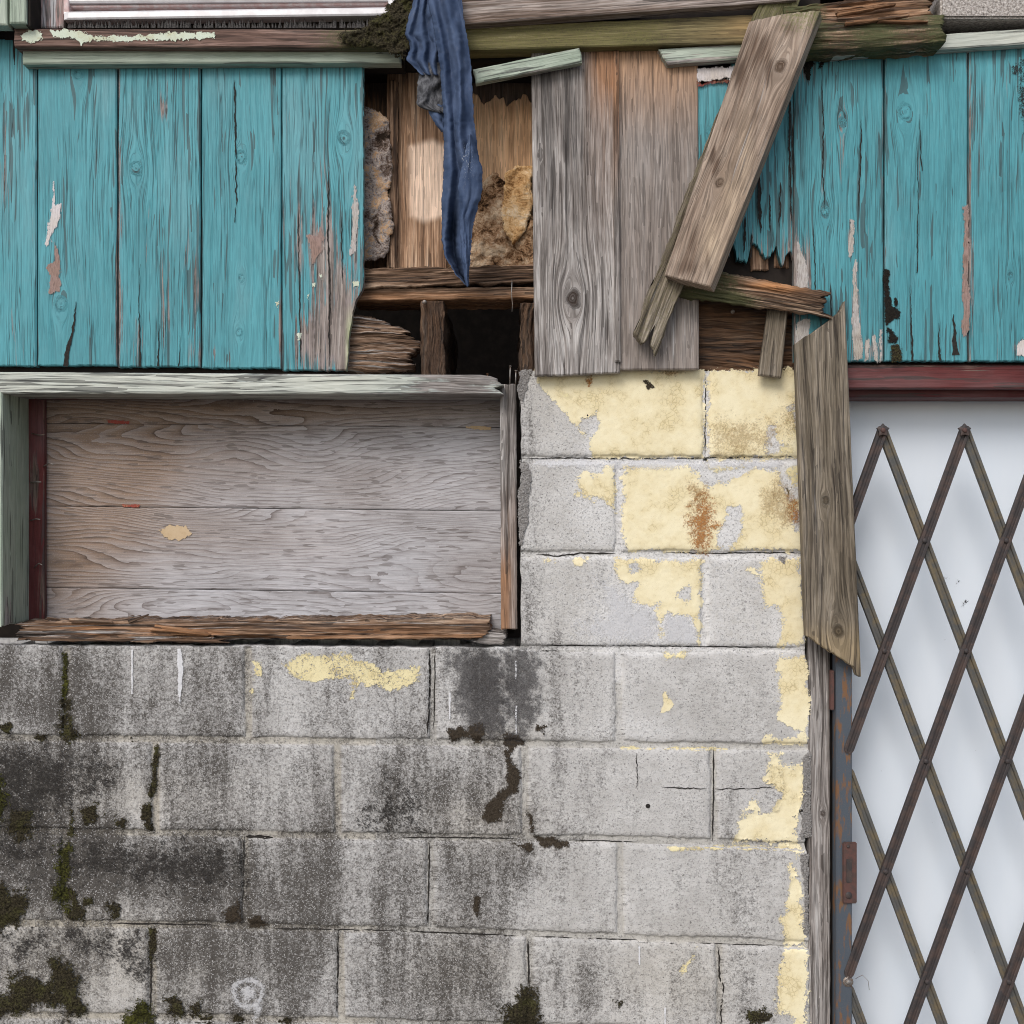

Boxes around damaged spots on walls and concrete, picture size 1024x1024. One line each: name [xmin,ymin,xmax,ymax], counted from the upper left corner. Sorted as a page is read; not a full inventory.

peeling [45,181,62,294]
peeling [306,227,325,299]
peeling [349,185,359,256]
peeling [848,219,883,363]
rust [687,486,721,556]
peeling [281,651,421,700]
peeling [517,366,813,1024]
water stain [443,642,548,824]
water stain [512,812,570,854]